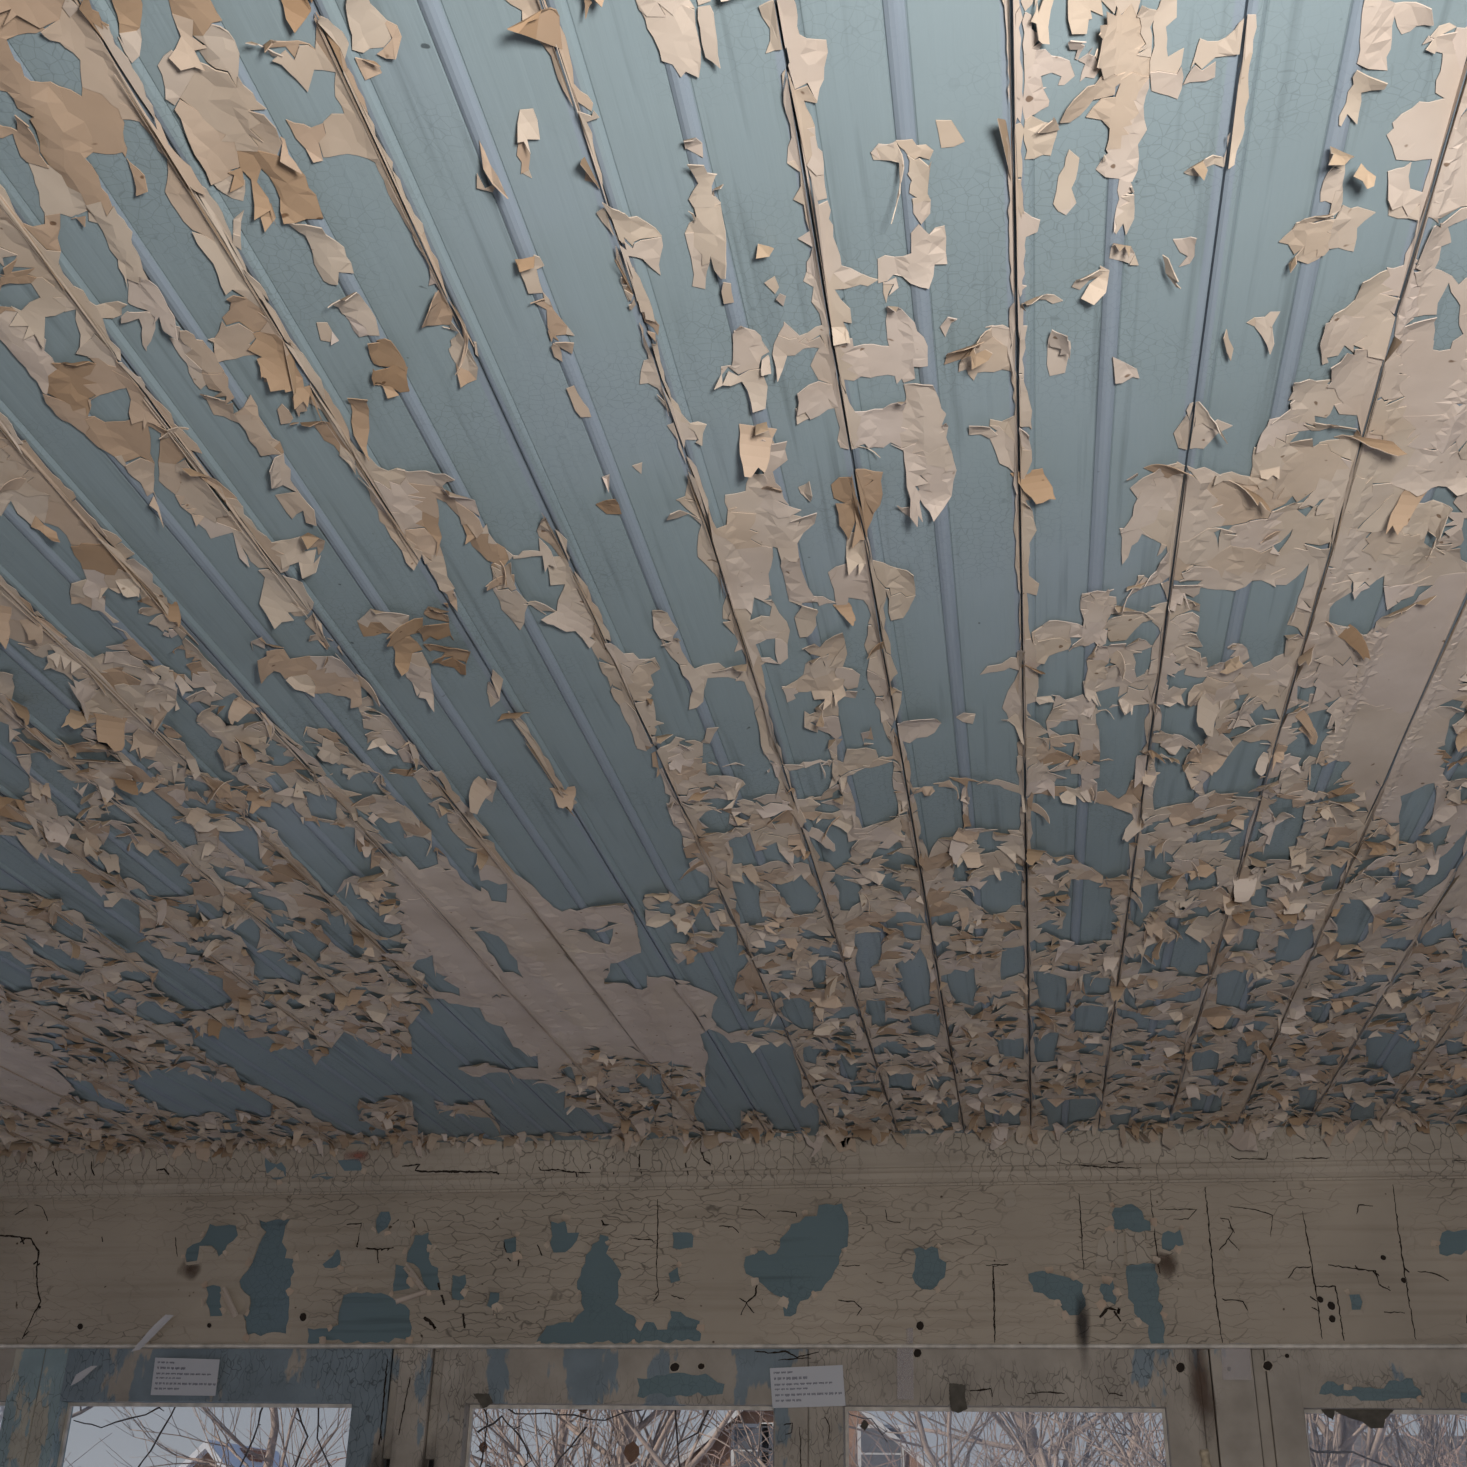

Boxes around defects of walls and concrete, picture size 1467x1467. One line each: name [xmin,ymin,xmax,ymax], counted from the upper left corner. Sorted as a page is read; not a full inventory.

peeling [158,0,354,285]
peeling [245,0,478,399]
peeling [506,0,707,447]
peeling [683,137,734,304]
peeling [714,0,965,527]
peeling [1013,0,1244,429]
peeling [1227,14,1257,169]
peeling [1279,146,1376,273]
peeling [1357,0,1434,70]
crack [1231,1152,1328,1160]
crack [0,1161,95,1339]
crack [1057,1161,1449,1343]